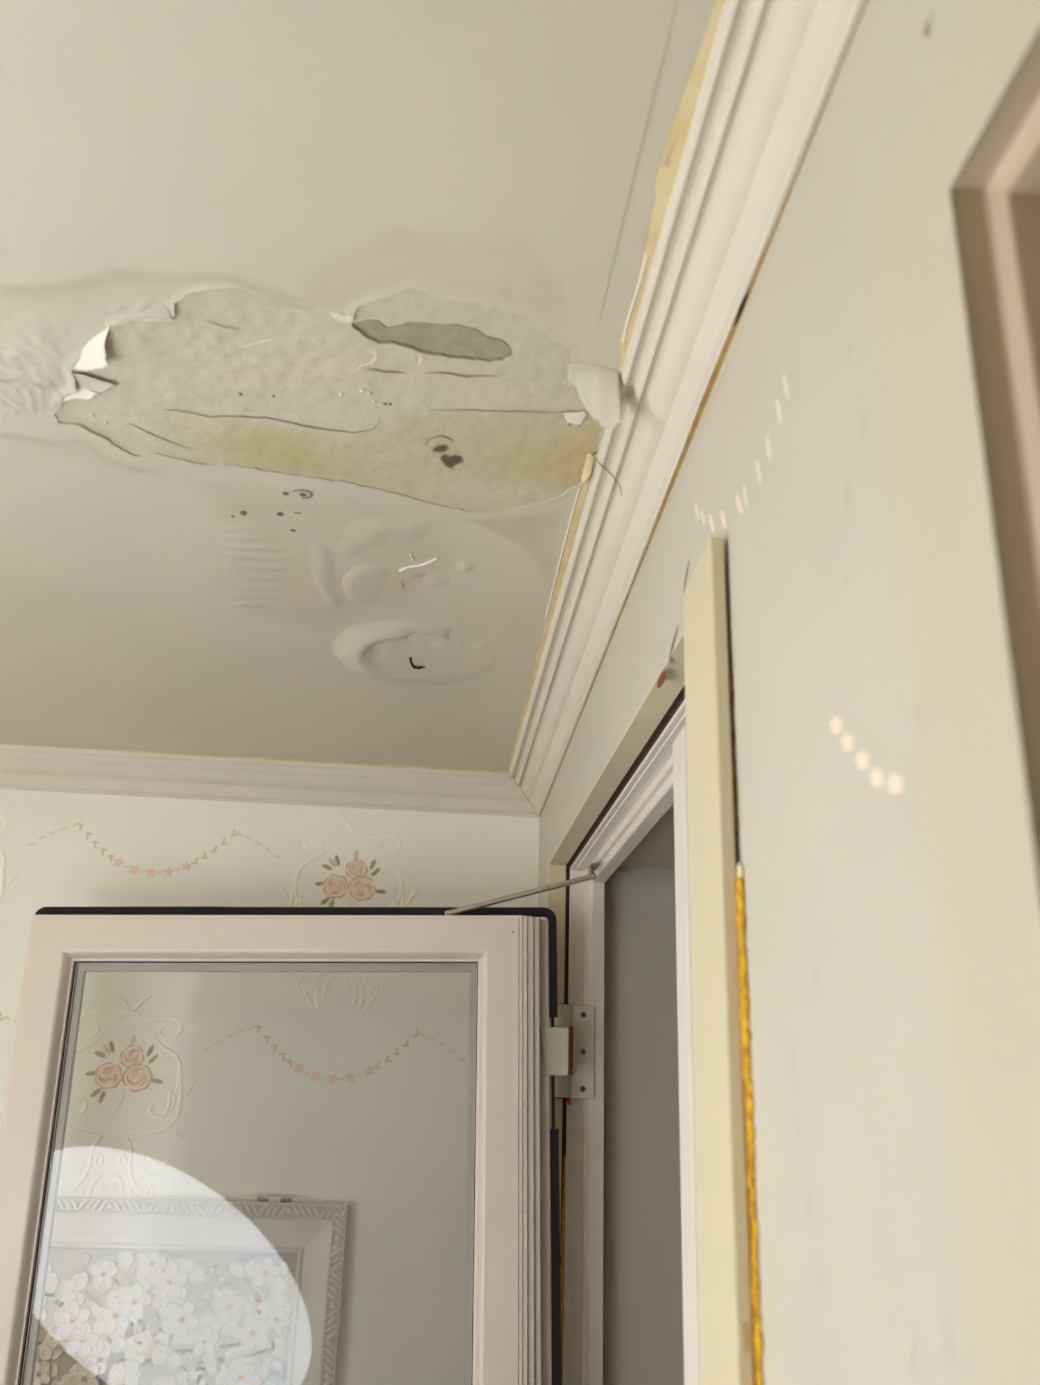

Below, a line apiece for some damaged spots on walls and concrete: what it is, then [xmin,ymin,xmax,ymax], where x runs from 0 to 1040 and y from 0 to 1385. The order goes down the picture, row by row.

peeling [54,279,622,516]